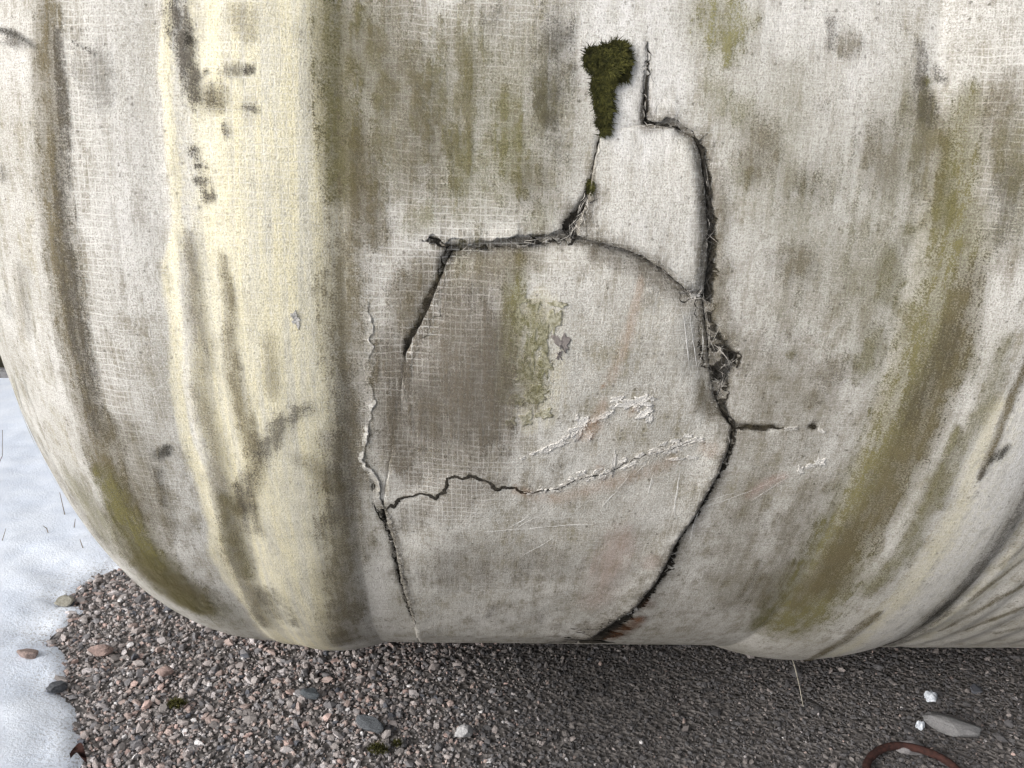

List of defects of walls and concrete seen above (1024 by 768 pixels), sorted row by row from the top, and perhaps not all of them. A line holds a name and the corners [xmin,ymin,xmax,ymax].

water stain [492,0,575,197]
mould [825,13,861,55]
water stain [863,39,950,205]
water stain [980,67,1024,195]
water stain [1,0,315,626]
water stain [294,0,551,644]
crack [371,42,784,643]
peeling [520,394,657,460]
peeling [526,434,704,495]
water stain [787,259,1024,608]
water stain [803,611,882,661]
water stain [885,492,1024,647]